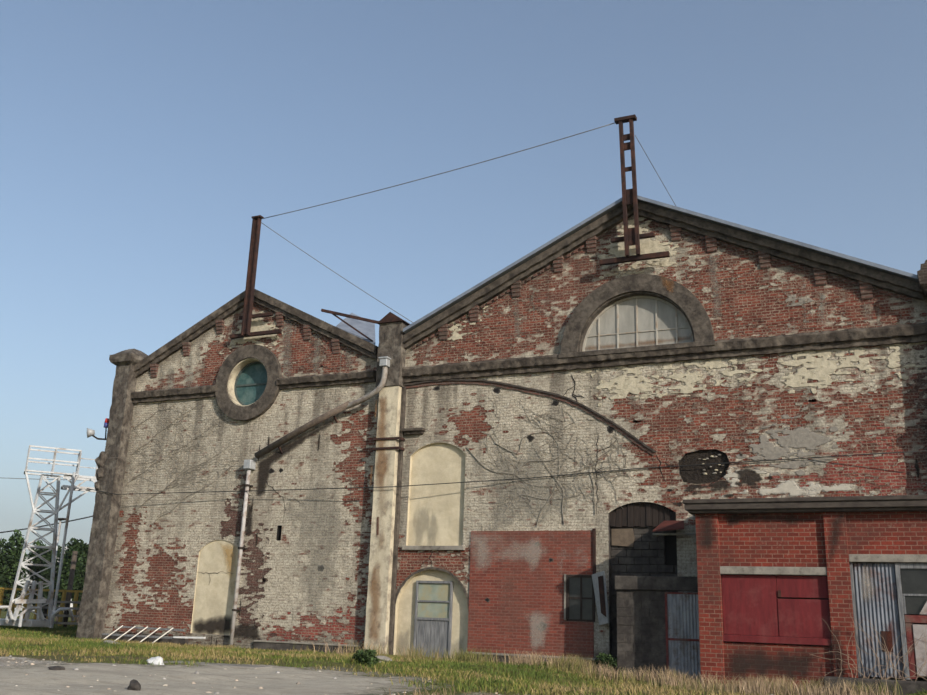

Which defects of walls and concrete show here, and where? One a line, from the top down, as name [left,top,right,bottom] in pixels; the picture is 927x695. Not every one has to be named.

peeling [193,310,358,386]
peeling [412,290,556,366]
peeling [438,387,509,454]
peeling [581,343,927,506]
peeling [220,410,377,647]
damp [726,514,811,524]
peeling [113,507,194,636]
damp [194,600,258,646]